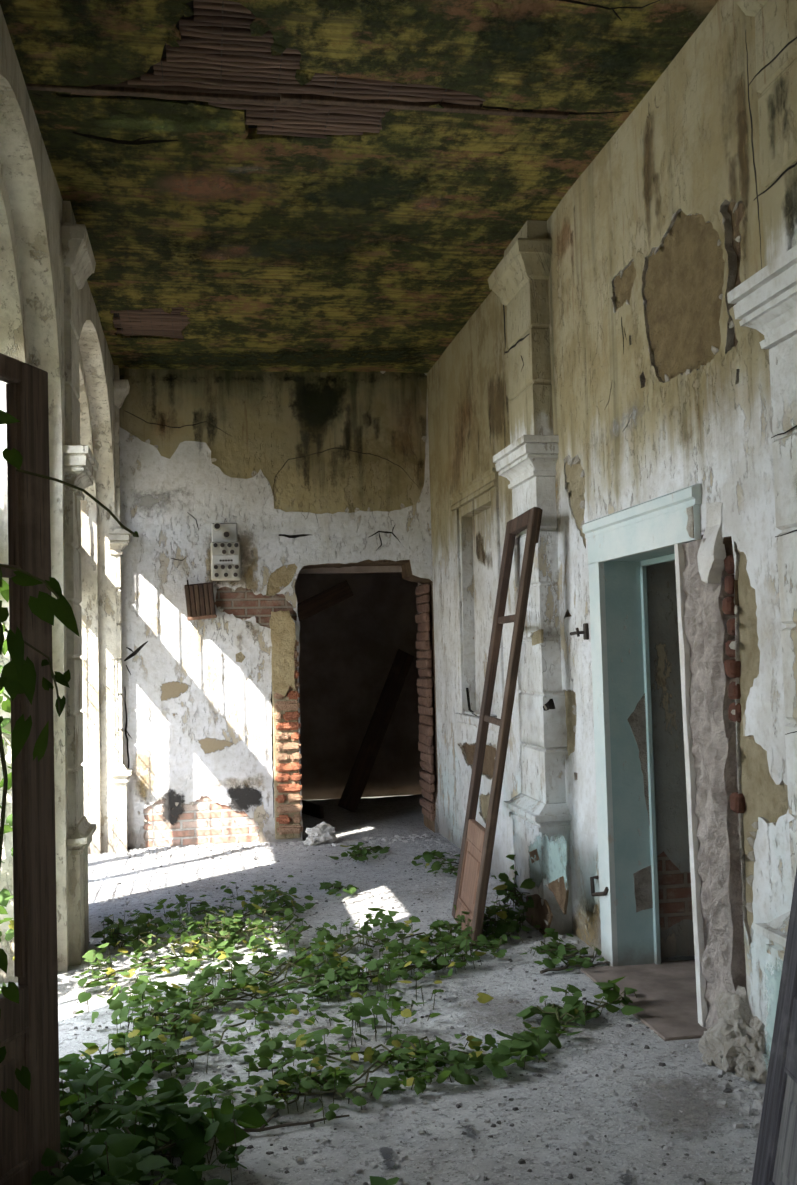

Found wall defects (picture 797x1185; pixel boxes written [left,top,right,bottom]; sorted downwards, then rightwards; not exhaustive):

crack [556,0,660,21]
damp [644,119,659,238]
damp [729,79,748,244]
crack [746,37,797,269]
damp [784,174,797,250]
flaking render [611,199,745,388]
peeling [119,368,427,514]
damp [290,383,379,485]
flaking render [215,563,297,628]
crack [368,525,400,548]
flaking render [563,455,586,549]
flaking render [686,502,788,945]